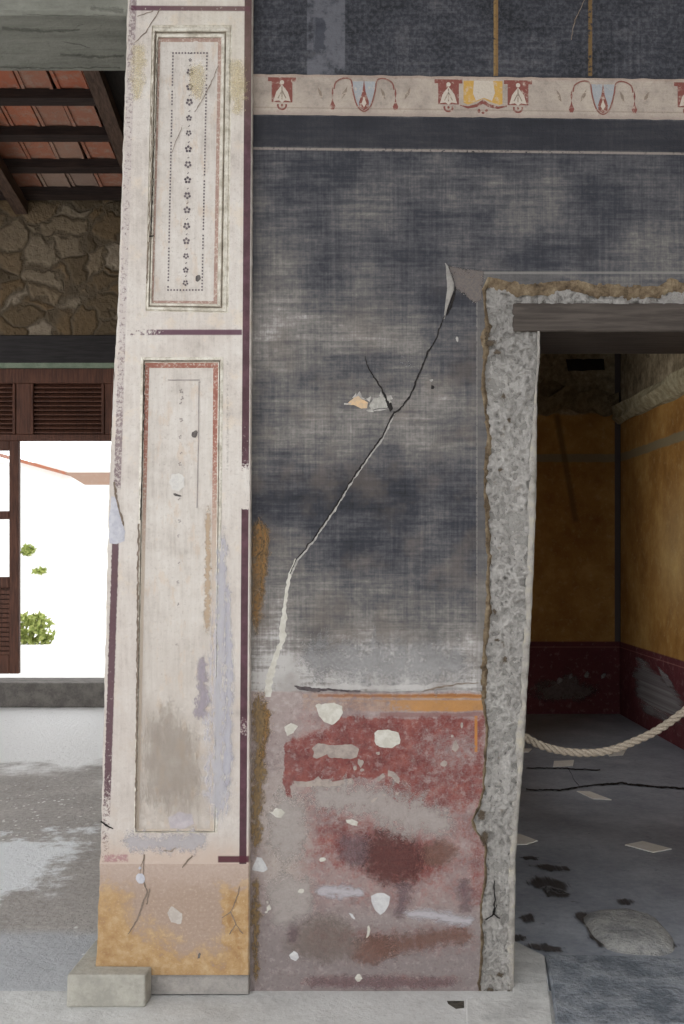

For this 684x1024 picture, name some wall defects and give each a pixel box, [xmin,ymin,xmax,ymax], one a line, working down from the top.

peeling [444,263,456,319]
crack [264,293,454,697]
spalling [294,277,684,991]
peeling [284,723,298,736]
crack [128,847,193,934]
crack [222,886,243,935]
crack [485,880,500,920]